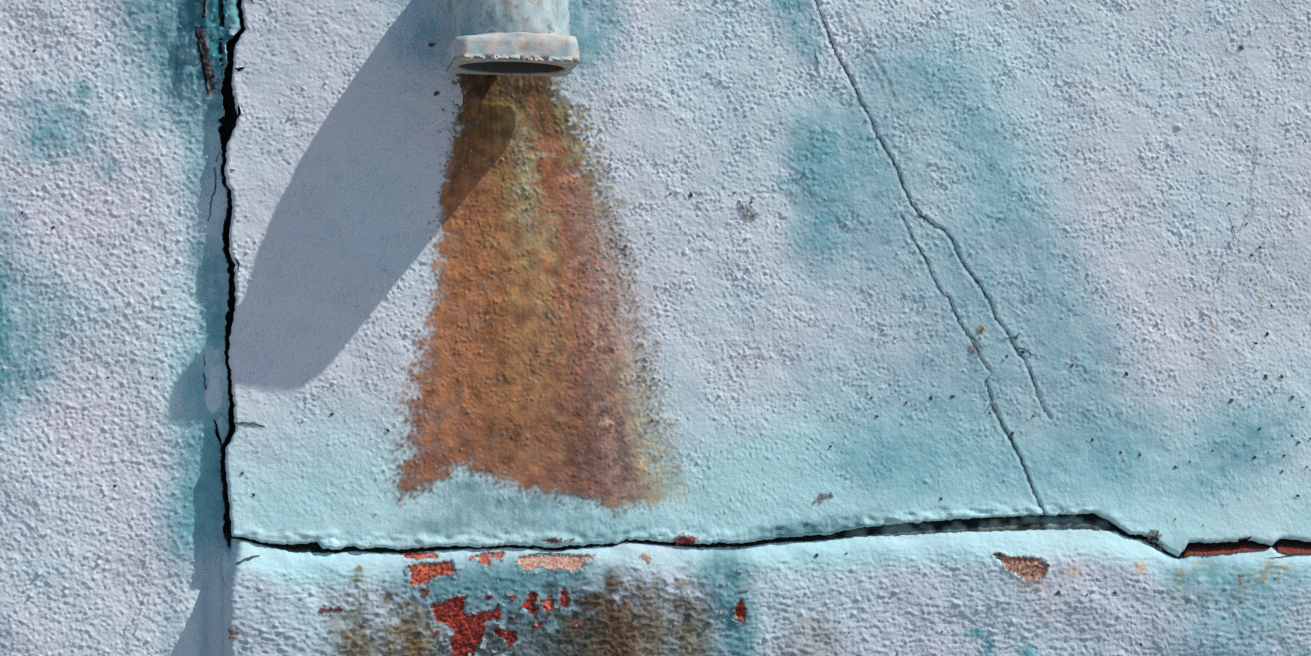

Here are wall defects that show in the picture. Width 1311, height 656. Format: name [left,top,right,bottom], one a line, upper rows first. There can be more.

rust [394,74,683,511]
crack [195,0,1311,564]
rust [340,596,445,656]
peeling [400,537,595,656]
rust [558,570,713,656]
spalling [992,552,1050,580]
spalling [1183,541,1311,557]